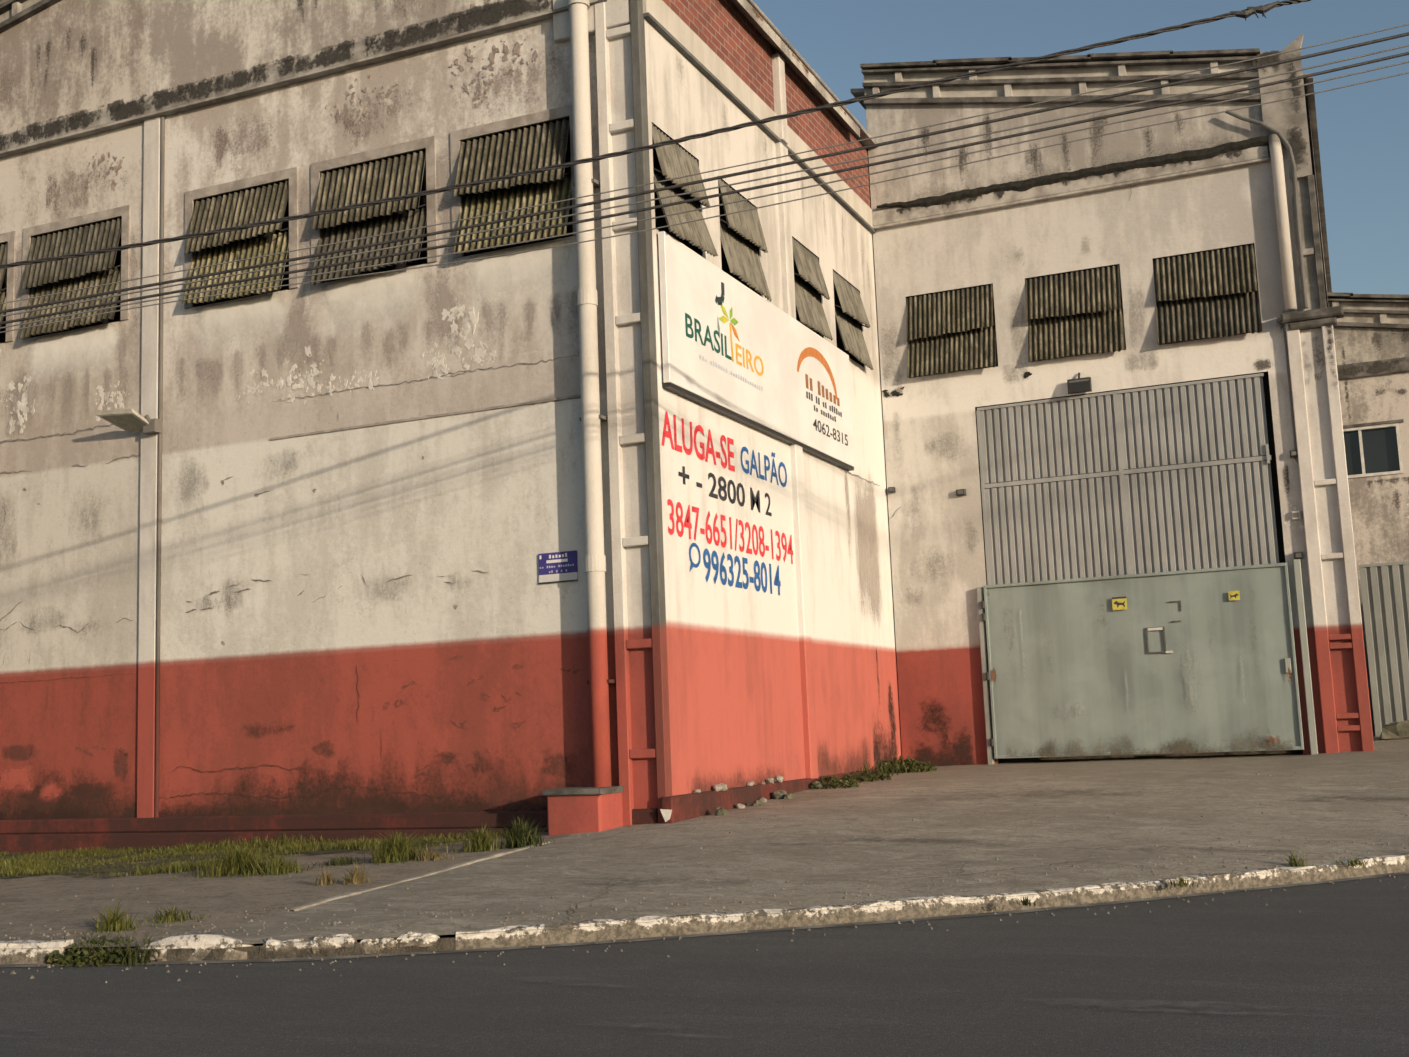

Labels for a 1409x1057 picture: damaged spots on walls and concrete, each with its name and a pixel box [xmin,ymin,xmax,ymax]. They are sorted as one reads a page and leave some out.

leakage [0,0,551,150]
peeling [421,298,496,381]
peeling [6,376,35,434]
peeling [95,380,129,422]
peeling [238,346,379,404]
crack [0,601,138,684]
leakage [818,679,897,775]
leakage [914,705,974,767]
leakage [0,754,137,820]
leakage [159,755,547,817]